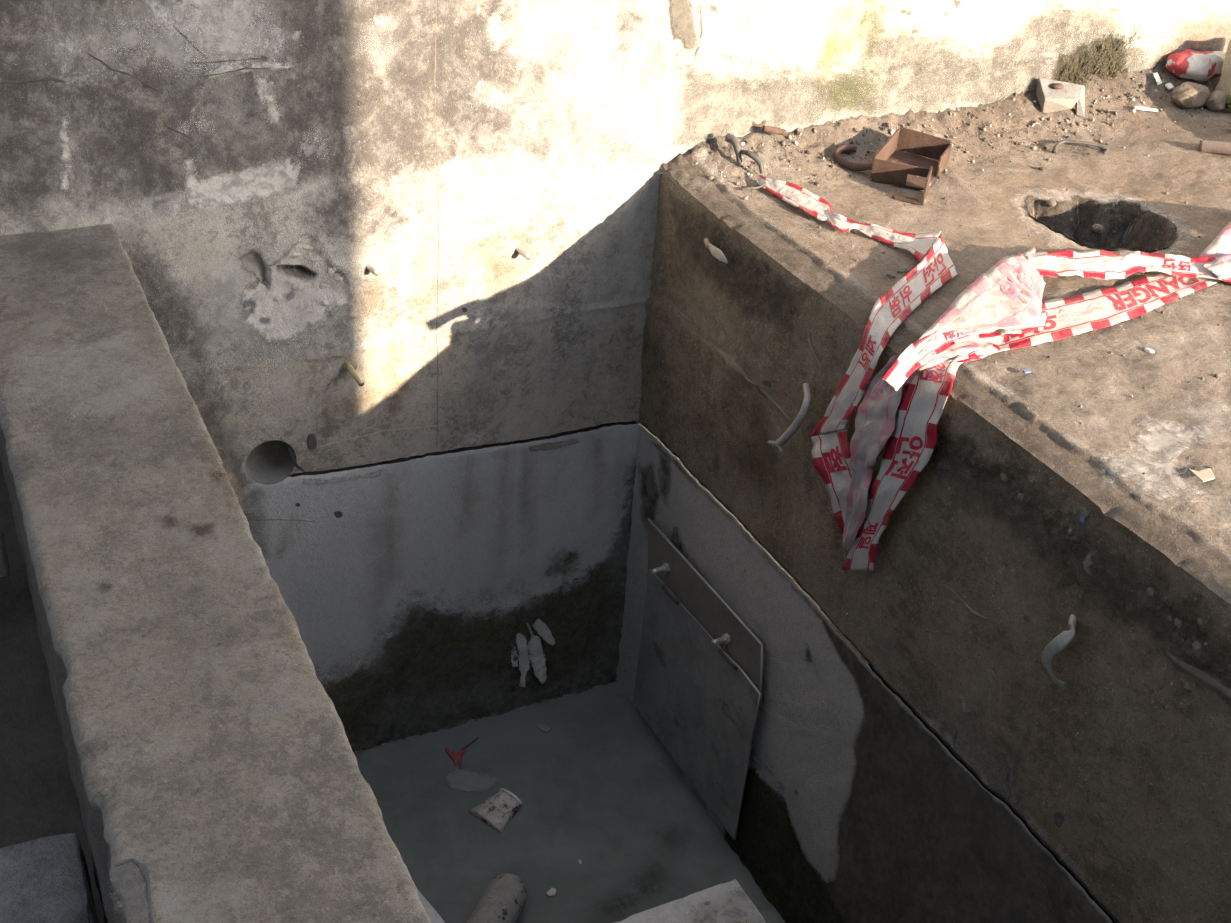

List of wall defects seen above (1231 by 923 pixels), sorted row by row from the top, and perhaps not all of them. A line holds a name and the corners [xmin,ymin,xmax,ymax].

crack [0,76,66,84]
peeling [120,0,299,66]
leakage [254,76,279,122]
leakage [684,6,1116,140]
peeling [670,0,1231,77]
leakage [59,118,71,190]
leakage [186,135,324,207]
spalling [241,234,355,342]
leakage [315,445,697,752]
leakage [747,599,1109,923]